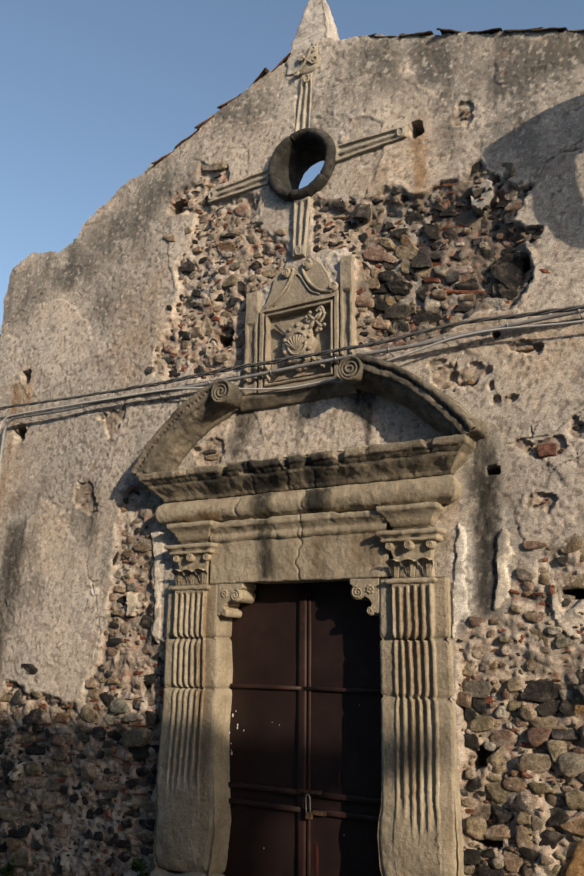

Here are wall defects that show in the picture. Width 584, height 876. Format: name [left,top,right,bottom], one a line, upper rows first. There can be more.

crack [537,138,584,178]
spalling [166,198,189,216]
spalling [213,324,235,348]
flaking render [508,338,545,355]
flaking render [513,415,584,460]
damp [204,454,330,577]
peeling [126,591,140,616]
peeling [151,529,166,643]
peeling [452,522,470,637]
peeling [493,527,516,609]
peeling [551,582,584,637]
spalling [474,743,493,770]